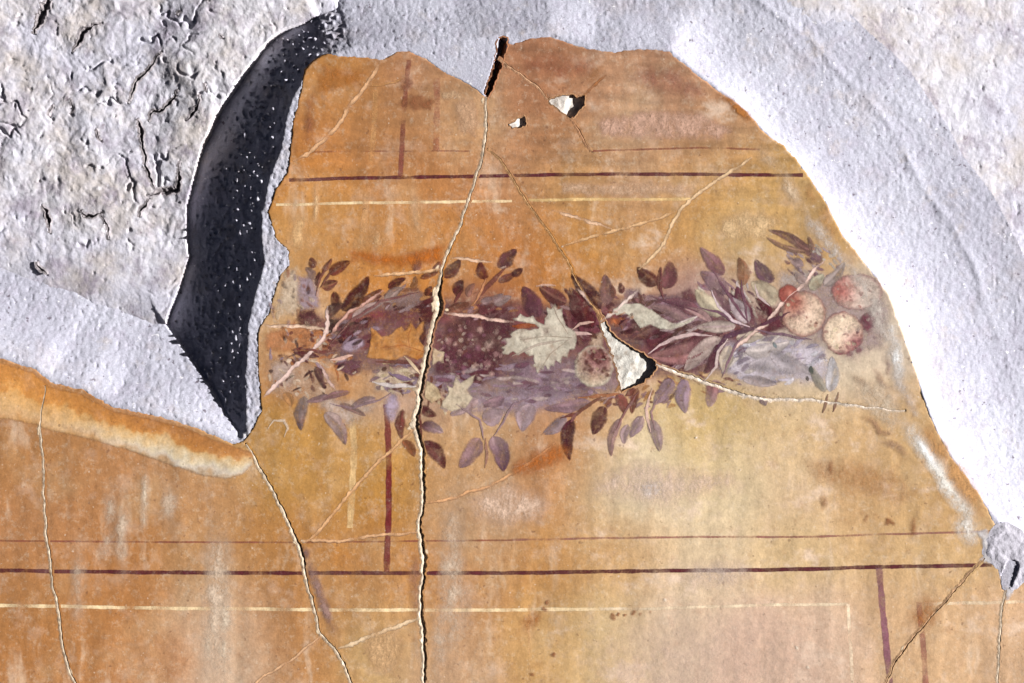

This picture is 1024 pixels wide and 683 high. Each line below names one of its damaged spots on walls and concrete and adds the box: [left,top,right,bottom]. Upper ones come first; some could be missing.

spalling [31,0,53,34]
spalling [135,88,184,217]
flaking render [548,93,587,120]
peeling [0,363,253,478]
crack [245,97,750,683]
flaking render [596,310,658,393]
crack [735,266,817,350]
crack [655,362,905,413]
crack [37,386,79,683]
peeling [912,430,976,540]
crack [883,557,985,683]
crack [995,590,1007,683]